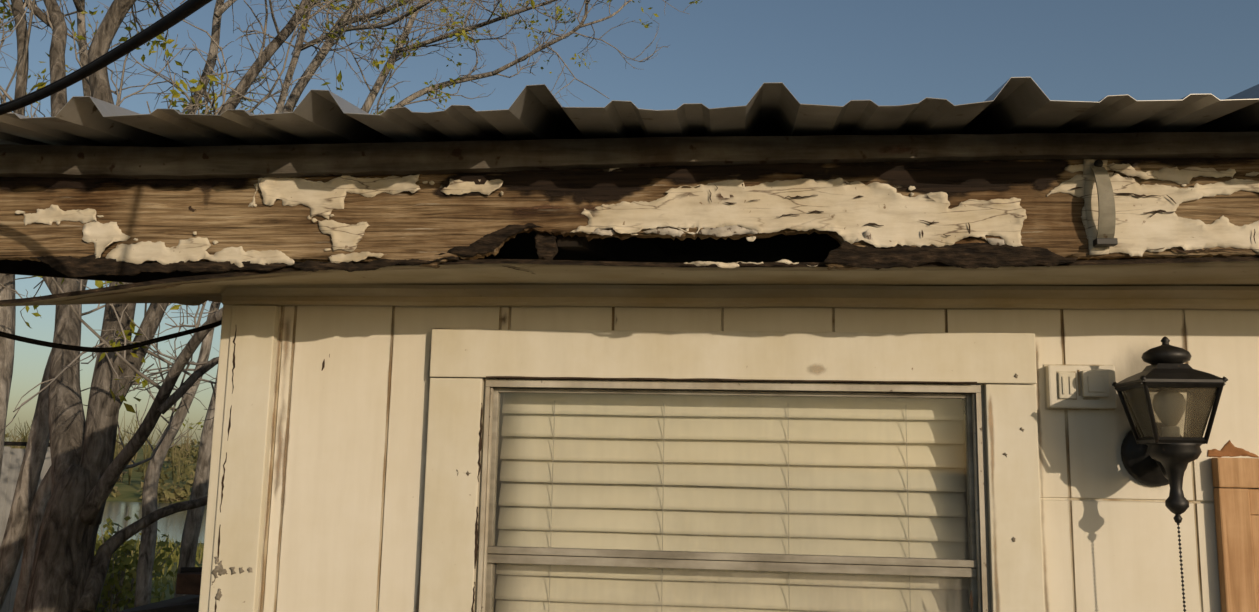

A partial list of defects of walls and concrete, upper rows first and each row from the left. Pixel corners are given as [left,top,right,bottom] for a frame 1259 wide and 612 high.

peeling [15,205,295,268]
peeling [248,174,503,263]
peeling [684,259,809,269]
peeling [570,178,1027,248]
peeling [1046,163,1259,257]
damp [273,350,290,509]
spalling [211,556,252,601]